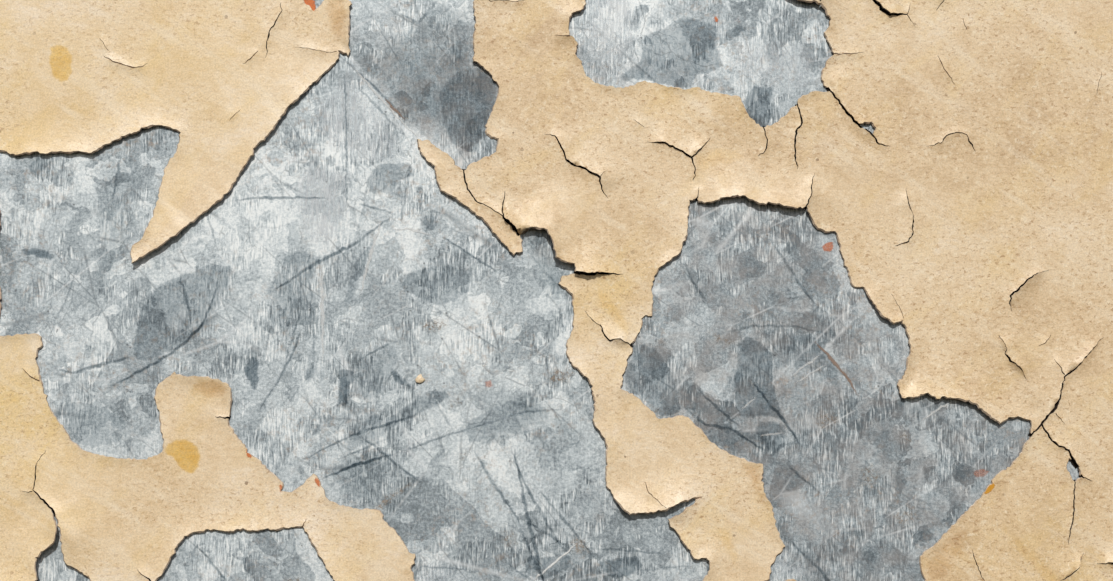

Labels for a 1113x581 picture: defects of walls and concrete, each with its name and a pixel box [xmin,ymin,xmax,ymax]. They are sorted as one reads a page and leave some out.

peeling [569,0,833,127]
crack [873,0,909,16]
crack [548,134,607,197]
crack [636,121,709,201]
peeling [0,0,709,581]
peeling [621,164,1031,581]
crack [1028,335,1113,580]